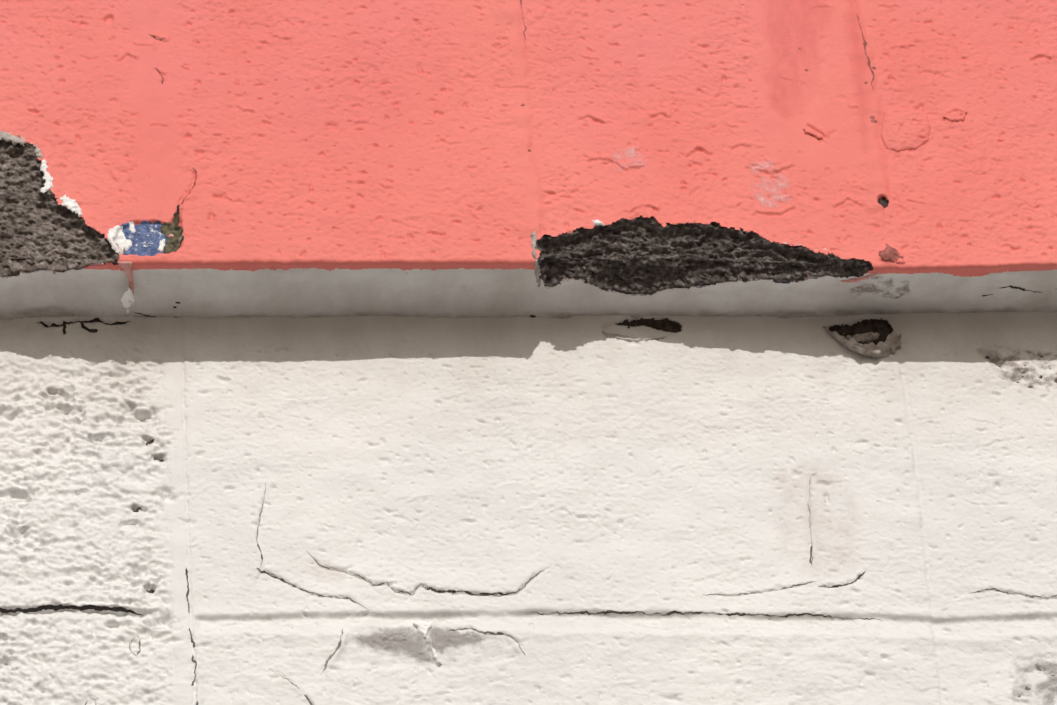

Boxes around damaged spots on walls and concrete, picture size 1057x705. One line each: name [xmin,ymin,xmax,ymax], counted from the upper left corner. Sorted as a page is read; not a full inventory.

spalling [0,130,184,313]
spalling [530,215,879,296]
crack [982,285,1042,296]
crack [36,302,180,335]
peeling [823,318,901,358]
crack [256,473,880,620]
crack [0,604,141,655]
crack [185,568,198,705]
crack [269,668,312,705]